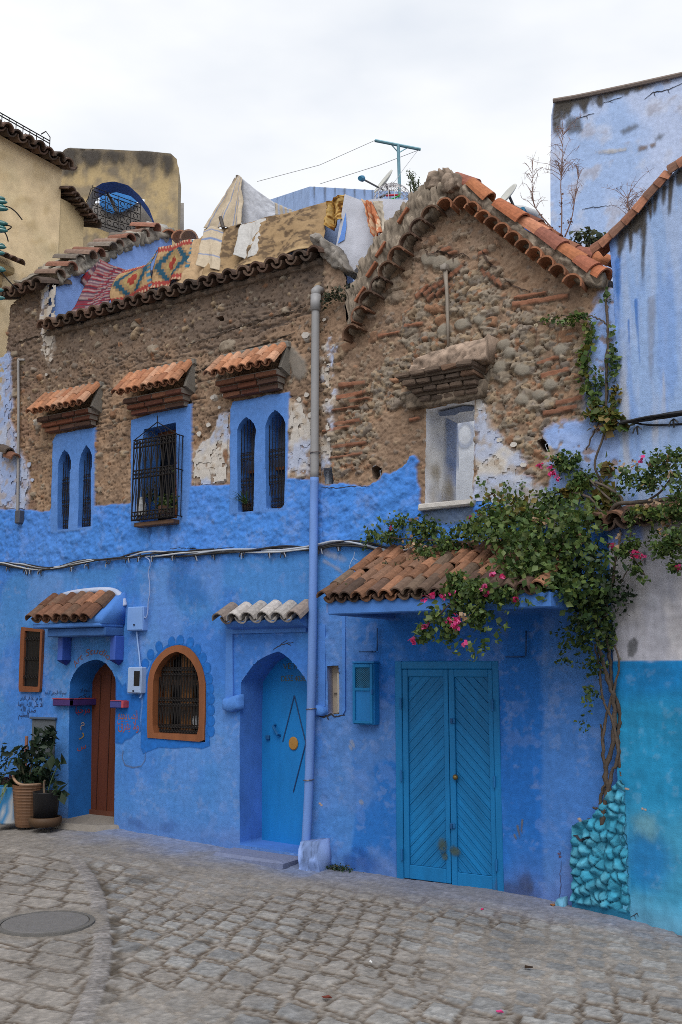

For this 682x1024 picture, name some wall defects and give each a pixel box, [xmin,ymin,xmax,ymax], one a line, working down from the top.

water stain [553,86,642,127]
water stain [616,169,682,295]
flaking render [323,344,335,401]
flaking render [0,353,34,509]
flaking render [193,394,228,485]
flaking render [289,392,332,472]
flaking render [423,399,556,527]